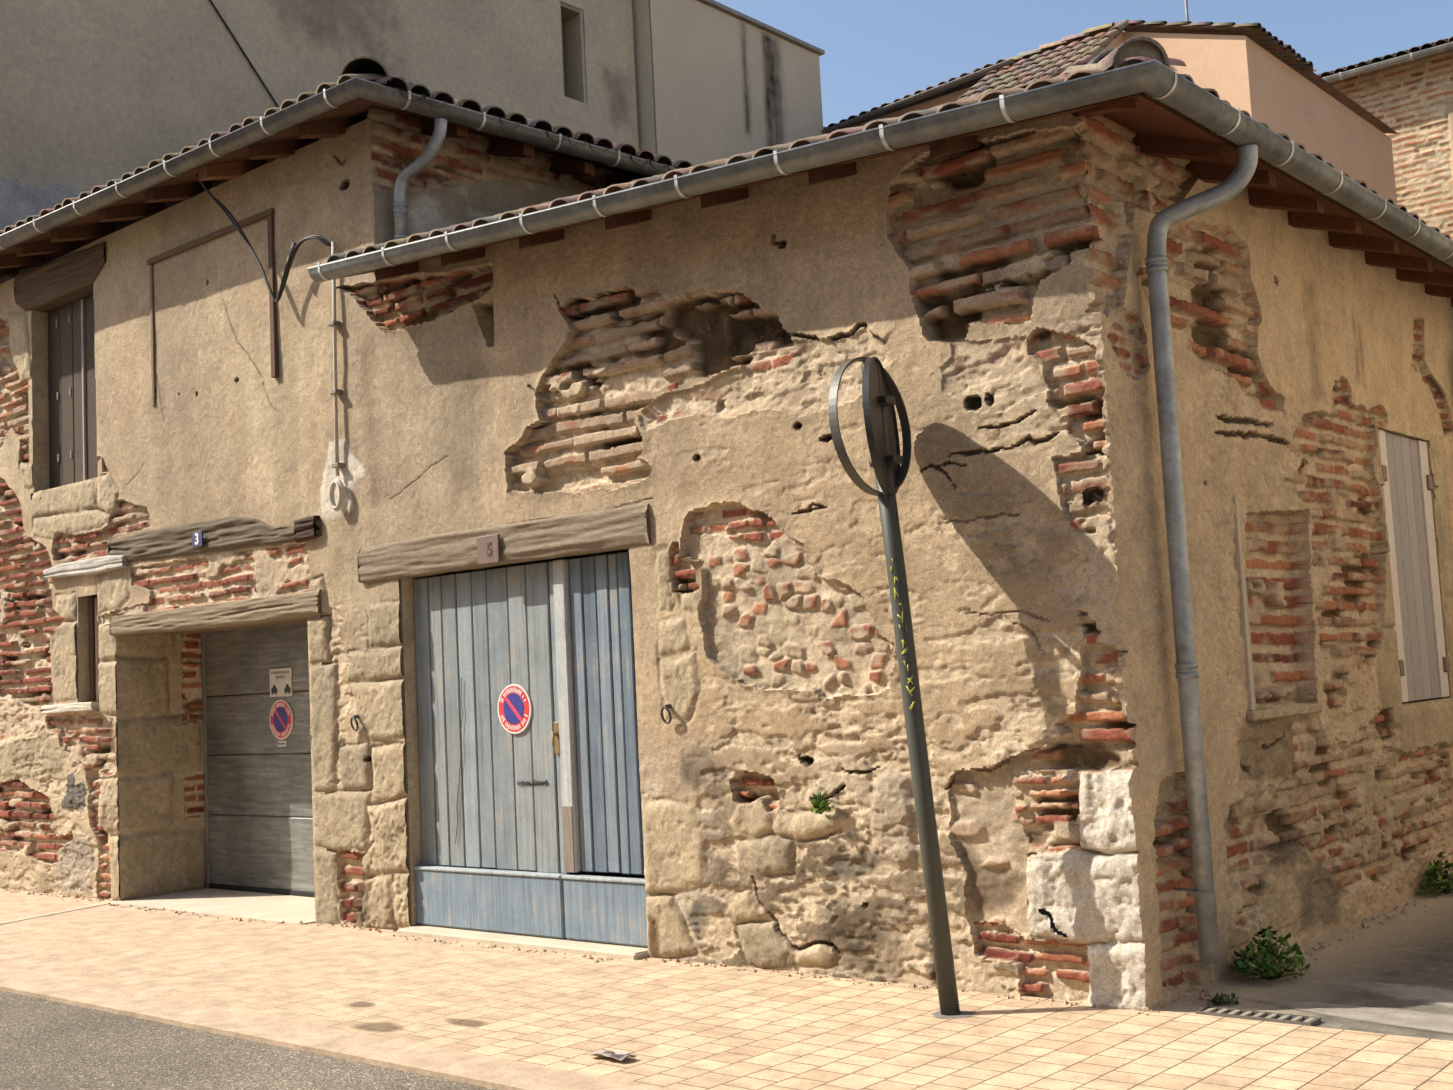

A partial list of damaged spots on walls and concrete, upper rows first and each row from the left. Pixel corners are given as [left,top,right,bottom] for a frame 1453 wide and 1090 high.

water stain [764,36,779,146]
flaking render [336,262,494,334]
flaking render [504,282,892,496]
crack [920,409,1060,525]
flaking render [98,542,311,625]
peeling [668,501,895,701]
flaking render [885,115,1199,1003]
flaking render [1166,220,1453,932]
flaking render [0,476,150,900]
flaking render [729,770,780,812]
crack [944,747,1043,791]
crack [750,875,841,956]